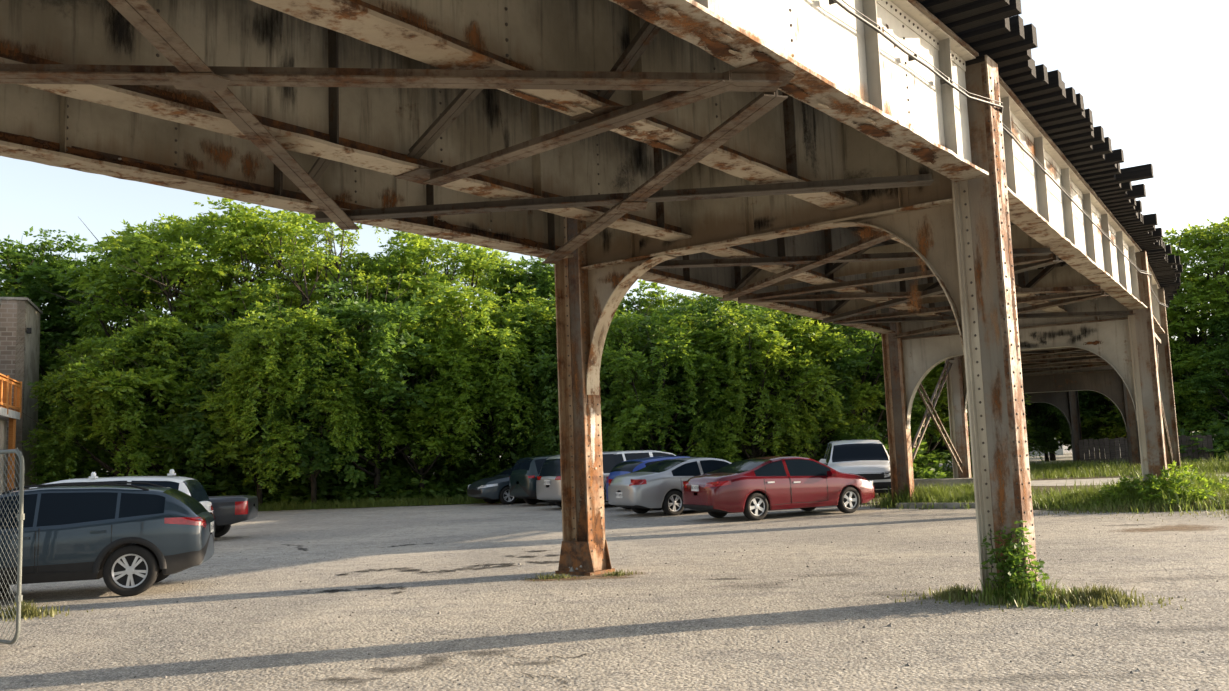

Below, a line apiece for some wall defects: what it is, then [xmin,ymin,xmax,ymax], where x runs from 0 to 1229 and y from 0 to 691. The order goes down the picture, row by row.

damp [109,3,132,50]
rust [379,1,439,36]
rust [187,143,262,178]
rust [994,79,1057,360]
rust [606,264,652,288]
rust [974,248,986,321]
rust [571,297,604,551]
rust [994,419,1027,567]